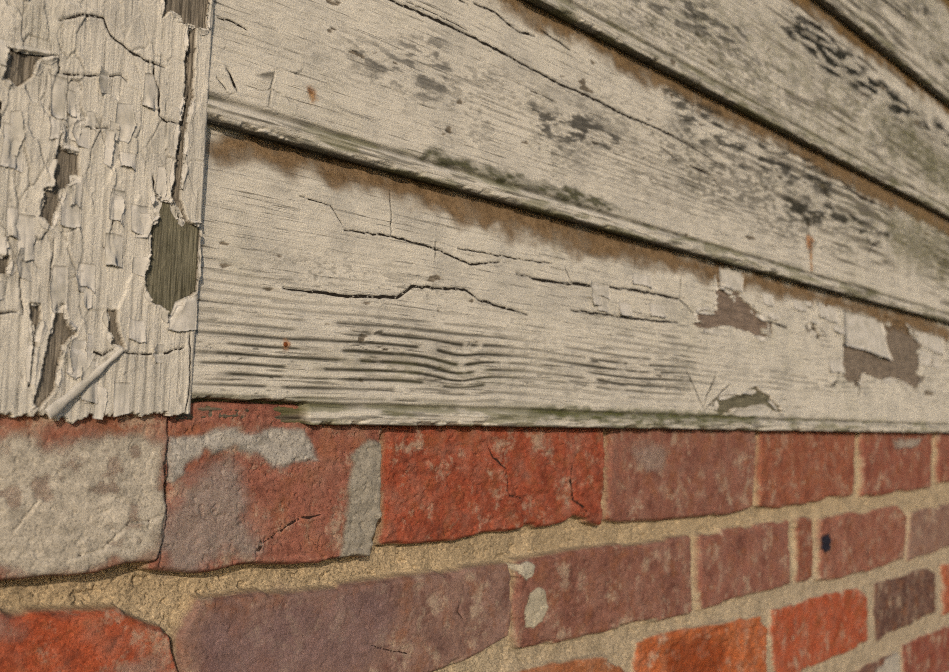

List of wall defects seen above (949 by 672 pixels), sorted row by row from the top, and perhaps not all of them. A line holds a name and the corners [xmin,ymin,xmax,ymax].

crack [389,0,726,189]
peeling [0,37,137,282]
peeling [109,0,213,332]
peeling [24,262,130,419]
peeling [102,311,165,363]
crack [283,194,694,323]
peeling [693,266,779,342]
peeling [713,387,780,417]
peeling [792,298,945,392]